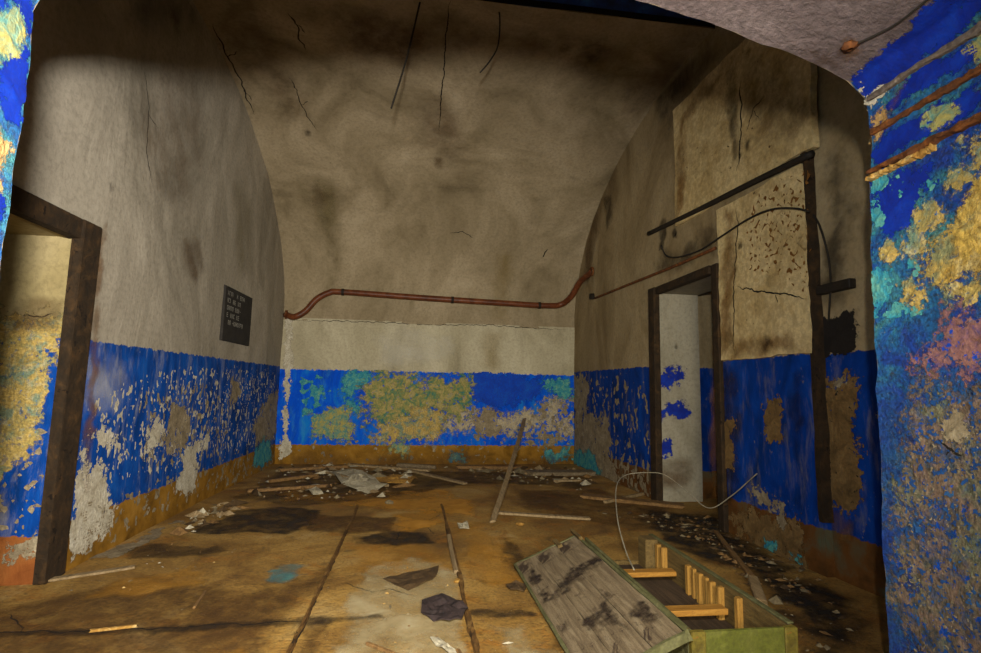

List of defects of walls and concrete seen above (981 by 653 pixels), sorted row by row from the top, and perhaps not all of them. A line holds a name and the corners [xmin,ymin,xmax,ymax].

crack [439,1,451,124]
peeling [851,0,981,164]
peeling [0,304,63,566]
peeling [69,319,651,570]
peeling [662,438,673,459]
peeling [661,365,687,390]
peeling [661,399,691,419]
peeling [724,417,737,473]
peeling [761,394,785,446]
peeling [823,308,860,358]
peeling [825,368,868,517]
peeling [869,130,981,653]